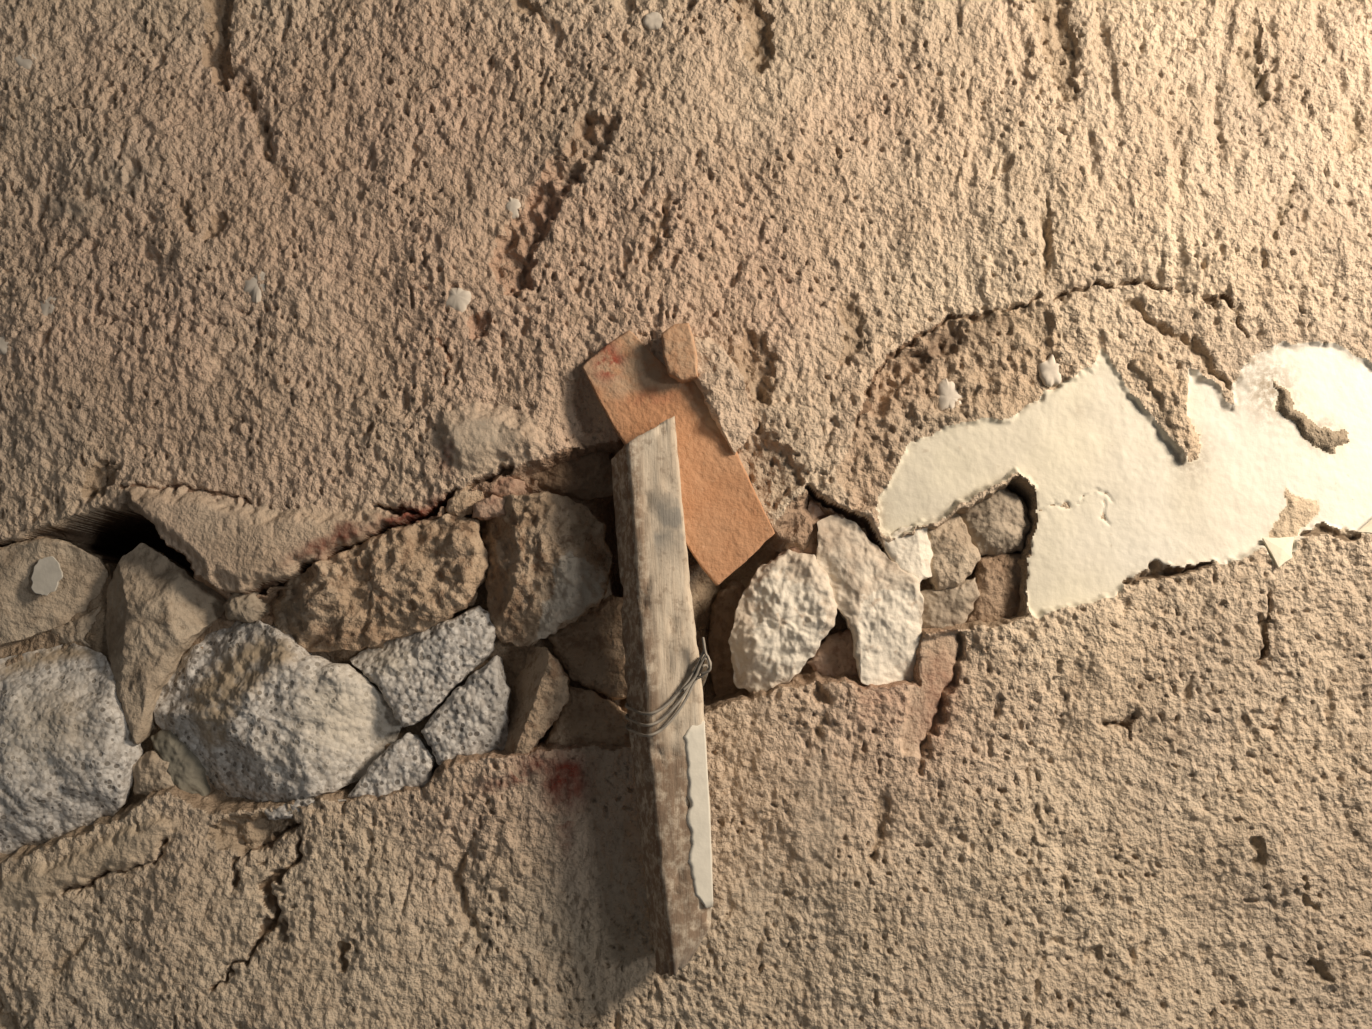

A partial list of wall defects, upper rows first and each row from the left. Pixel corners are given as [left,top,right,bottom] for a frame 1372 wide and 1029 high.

spalling [1271,184,1294,241]
crack [852,278,1248,441]
peeling [836,200,1372,619]
spalling [81,460,121,498]
crack [0,439,624,667]
crack [686,476,1108,777]
spalling [811,681,830,739]
spalling [207,811,298,856]
crack [0,580,631,991]
spalling [867,796,891,864]
spalling [449,852,483,946]